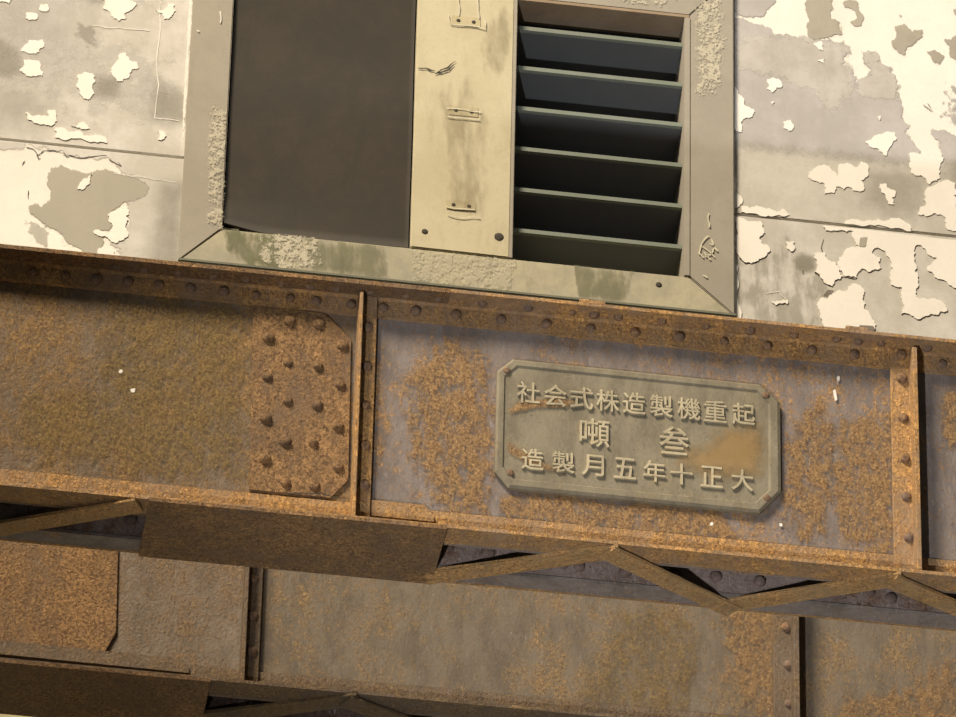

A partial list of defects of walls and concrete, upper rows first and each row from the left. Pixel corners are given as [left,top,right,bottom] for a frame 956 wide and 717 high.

peeling [0,0,193,261]
crack [418,61,456,74]
peeling [734,0,956,340]
rust [400,334,744,540]
rust [781,394,893,555]
rust [938,391,956,448]
rust [713,611,774,717]
rust [837,658,956,717]